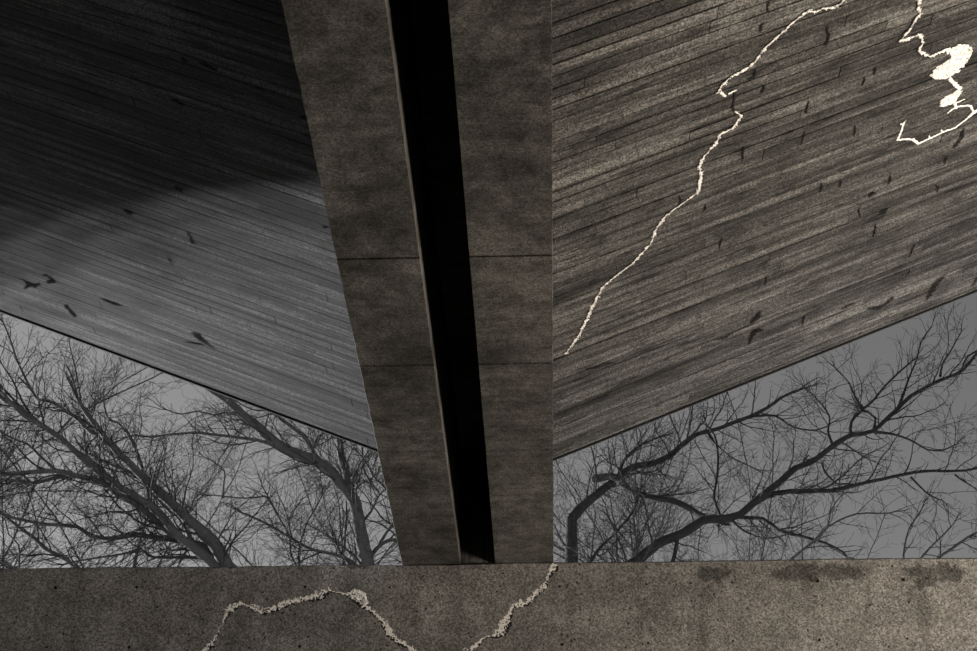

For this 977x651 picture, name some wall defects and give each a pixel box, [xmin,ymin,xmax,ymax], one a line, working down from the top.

crack [564,0,847,354]
crack [897,0,977,192]
crack [202,584,417,651]
crack [463,563,559,651]